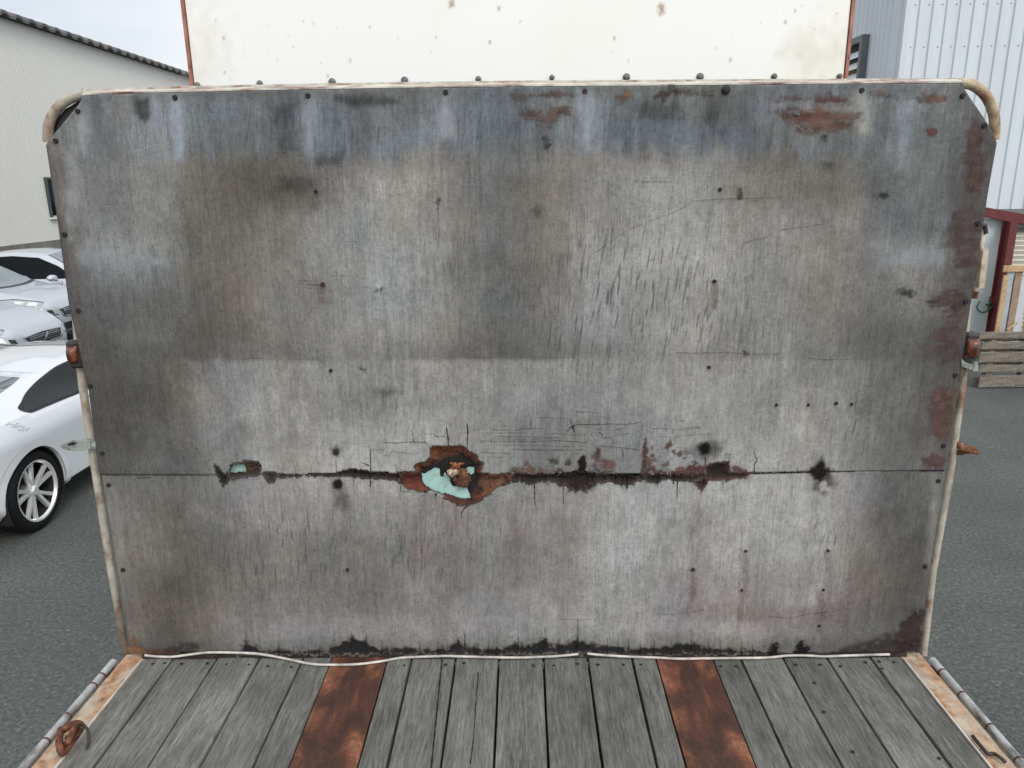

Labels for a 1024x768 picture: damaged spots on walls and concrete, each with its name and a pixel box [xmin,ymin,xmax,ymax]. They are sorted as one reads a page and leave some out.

peeling [447,451,484,478]
crack [753,460,855,474]